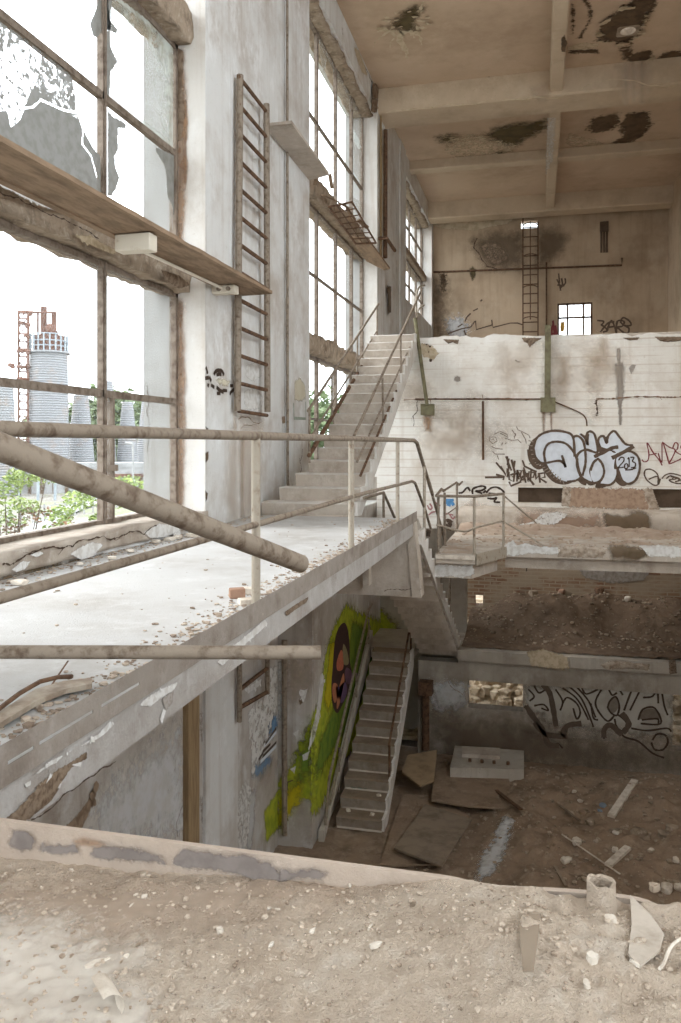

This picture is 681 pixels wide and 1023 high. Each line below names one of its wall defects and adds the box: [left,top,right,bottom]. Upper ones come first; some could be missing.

damp [373,1,431,59]
damp [568,0,681,62]
damp [487,121,547,154]
damp [585,111,655,144]
crack [2,525,157,566]
spalling [7,721,114,828]